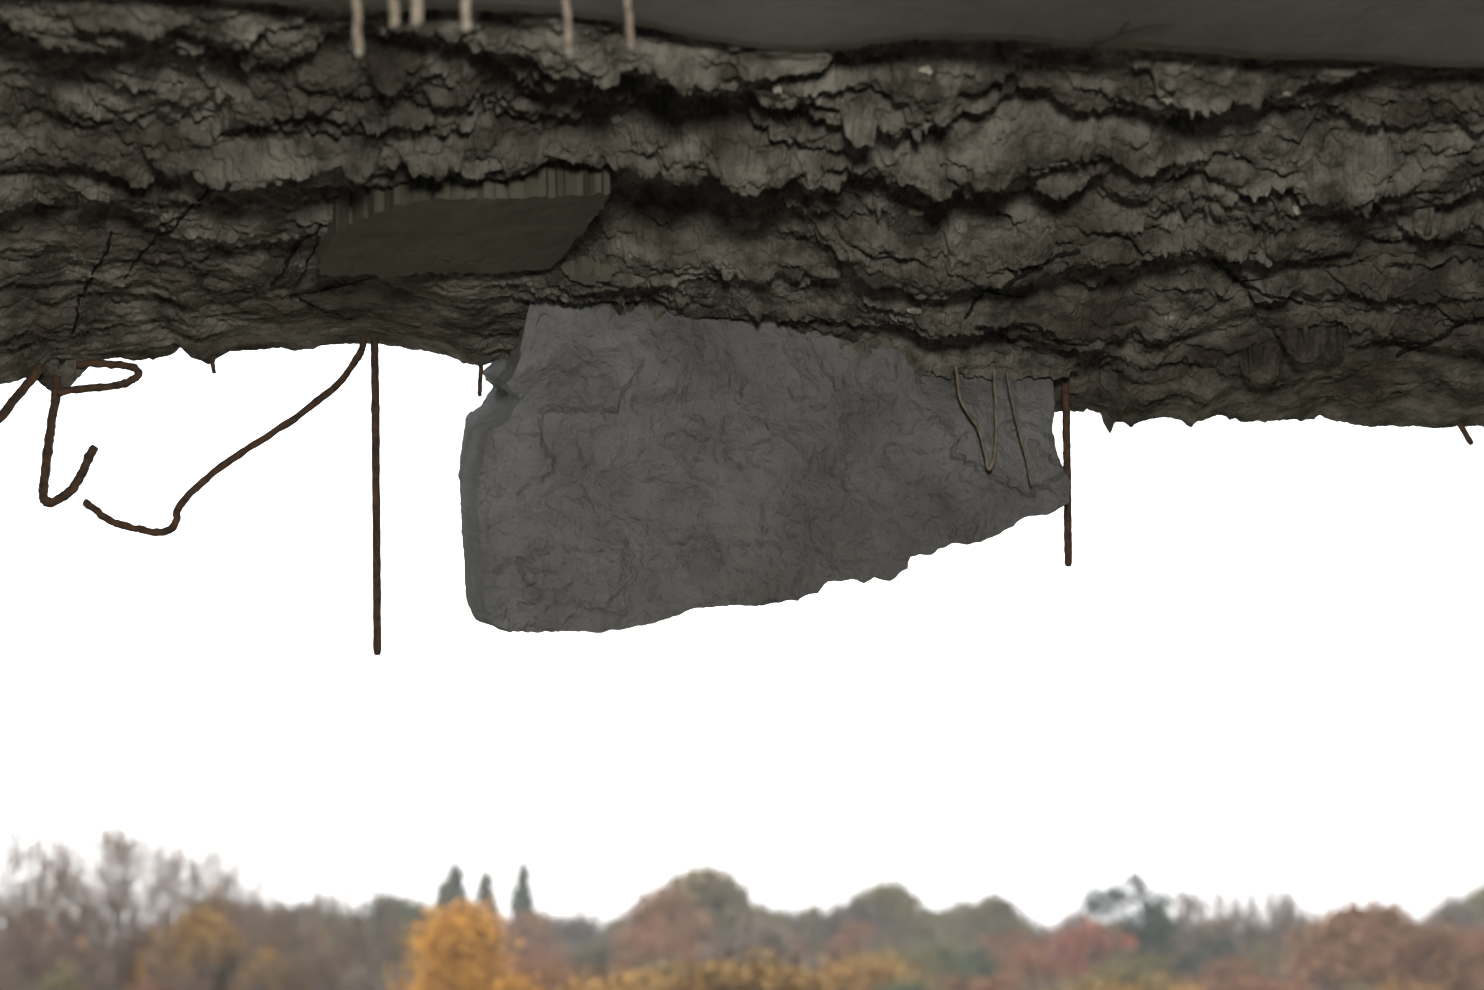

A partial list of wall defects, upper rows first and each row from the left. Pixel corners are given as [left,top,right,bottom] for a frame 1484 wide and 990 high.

spalling [0,0,1484,655]